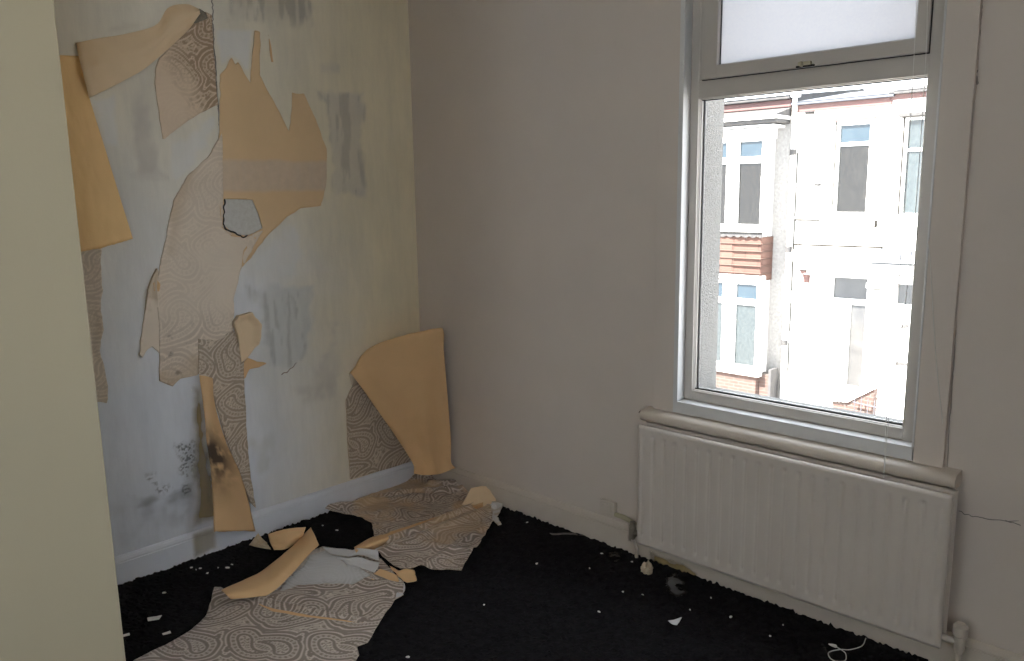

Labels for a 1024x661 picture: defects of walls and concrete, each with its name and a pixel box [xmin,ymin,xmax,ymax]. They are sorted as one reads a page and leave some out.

spalling [224,199,262,235]
peeling [139,268,160,358]
peeling [232,312,266,378]
water stain [197,403,213,519]
crack [959,511,1021,526]